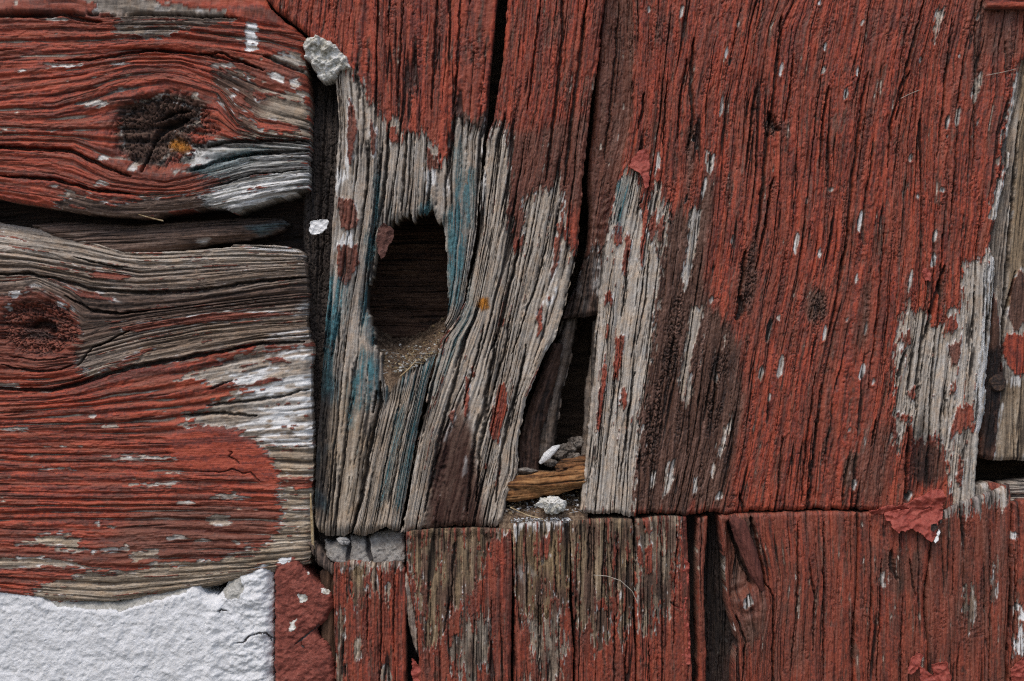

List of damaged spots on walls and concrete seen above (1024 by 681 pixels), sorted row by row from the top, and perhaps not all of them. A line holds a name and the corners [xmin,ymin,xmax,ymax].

peeling [0,51,728,681]
crack [659,335,826,681]
crack [818,88,829,169]
crack [840,463,848,504]
crack [828,75,867,336]
peeling [884,60,1024,543]